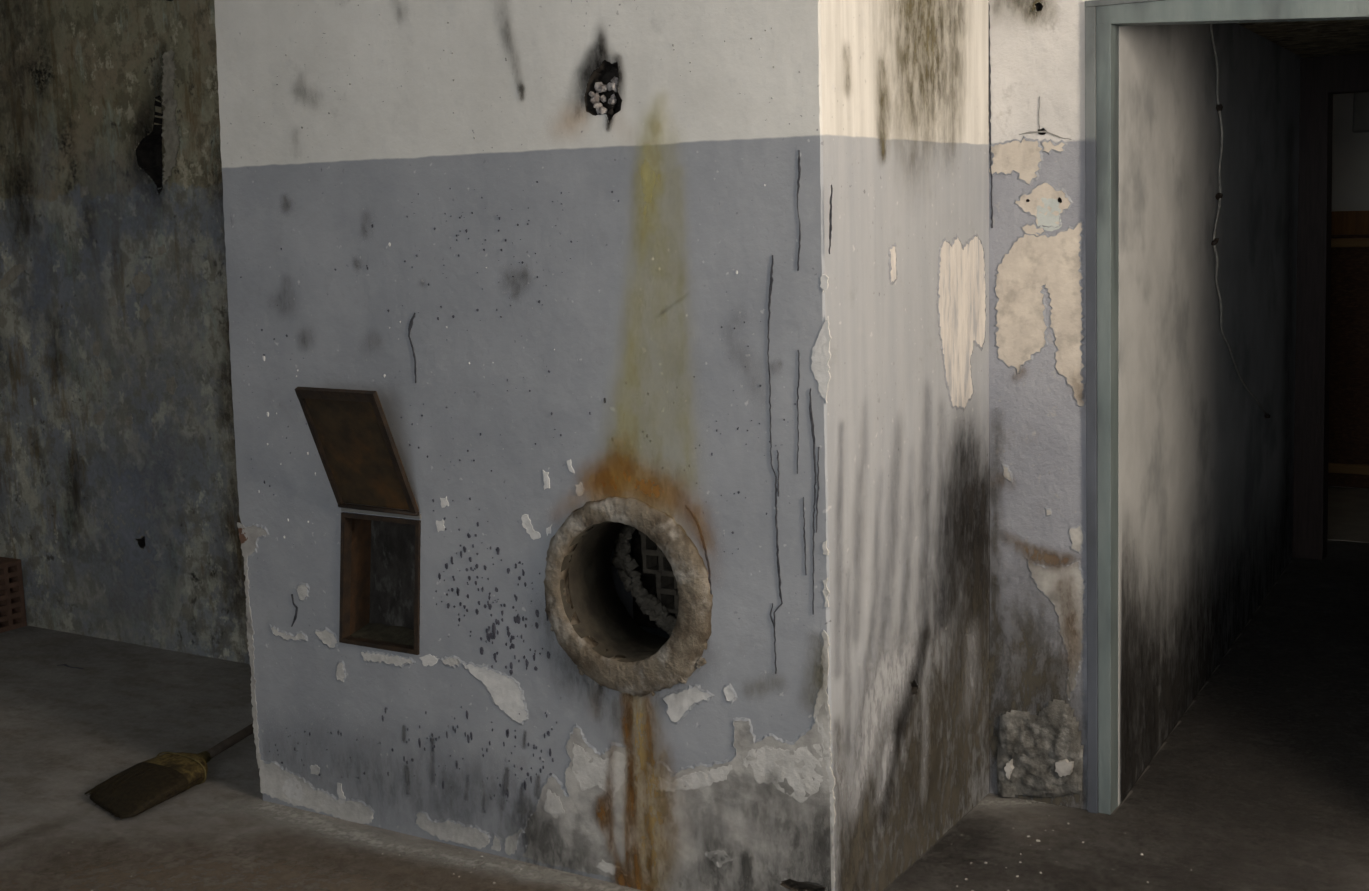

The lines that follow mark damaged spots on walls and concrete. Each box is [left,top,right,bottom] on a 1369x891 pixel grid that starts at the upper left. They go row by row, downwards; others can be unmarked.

hole [584,61,622,121]
water stain [880,0,944,158]
crack [408,313,416,383]
corrosion [594,465,679,506]
crack [767,150,833,674]
peeling [936,136,1086,412]
water stain [235,768,638,891]
peeling [361,650,529,726]
peeling [415,630,836,891]
corrosion [596,694,664,891]
water stain [784,575,1096,891]
water stain [1122,578,1144,744]